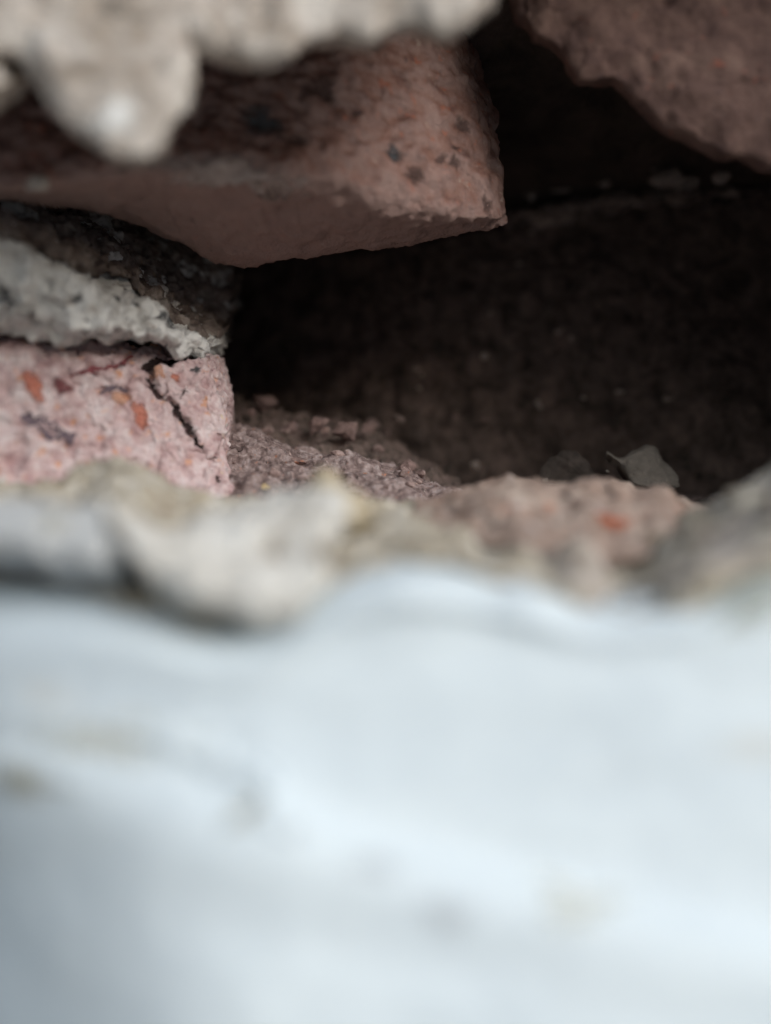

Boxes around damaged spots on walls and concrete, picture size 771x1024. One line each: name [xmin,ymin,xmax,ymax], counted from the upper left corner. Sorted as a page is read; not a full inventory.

peeling [0,0,496,165]
spalling [158,311,175,329]
spalling [20,412,76,445]
crack [142,357,241,482]
spalling [539,450,609,484]
flaking render [0,456,771,634]